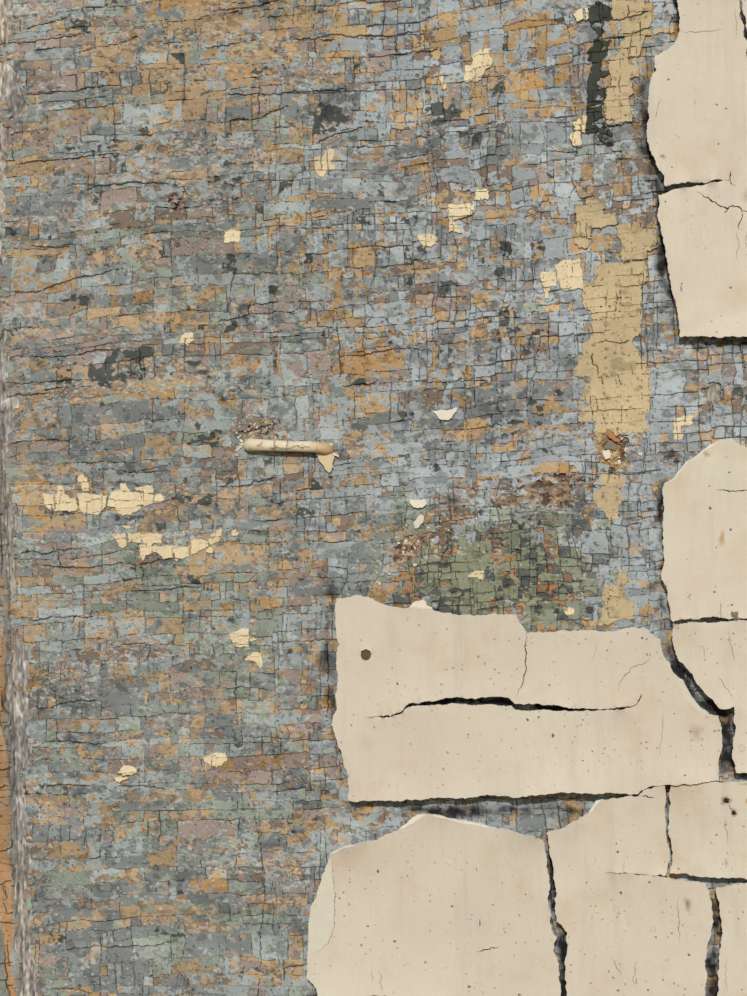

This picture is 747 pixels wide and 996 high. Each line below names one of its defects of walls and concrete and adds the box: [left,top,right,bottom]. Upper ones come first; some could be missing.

crack [735,0,747,54]
peeling [463,48,494,83]
peeling [448,189,490,234]
peeling [490,0,747,521]
peeling [433,408,458,421]
peeling [42,474,240,563]
crack [365,703,435,718]
crack [455,697,538,711]
peeling [306,438,747,996]
crack [573,695,642,711]
crack [699,707,747,784]
crack [657,785,747,996]